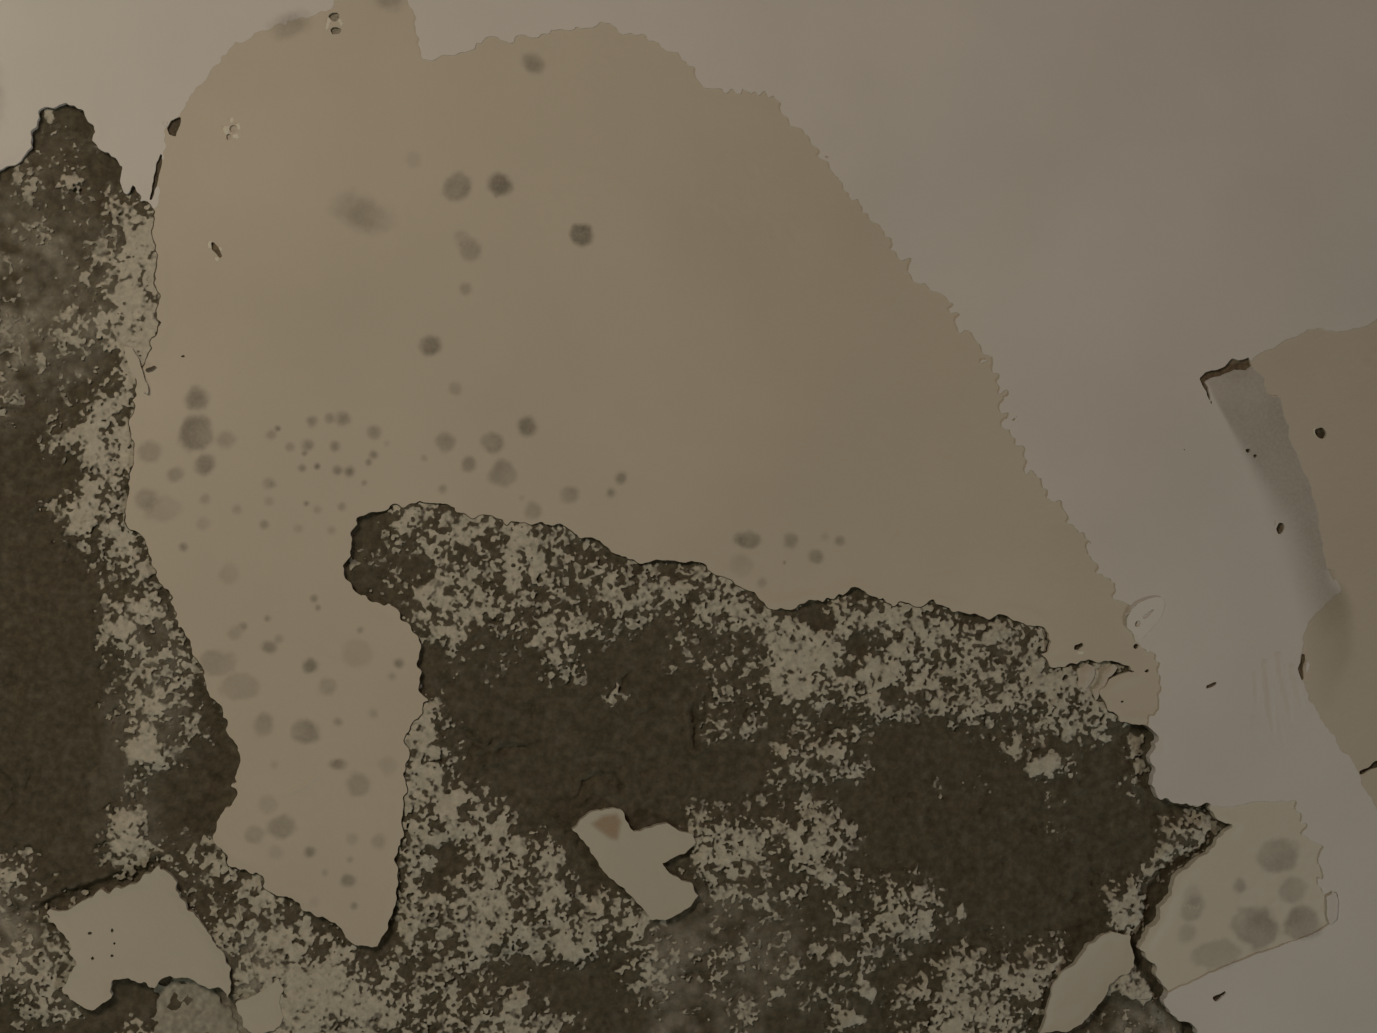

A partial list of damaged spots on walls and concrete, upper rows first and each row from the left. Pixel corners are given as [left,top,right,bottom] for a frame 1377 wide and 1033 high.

spalling [0,105,259,1033]
peeling [124,0,1165,947]
spalling [228,501,1338,1033]
peeling [1248,319,1377,808]